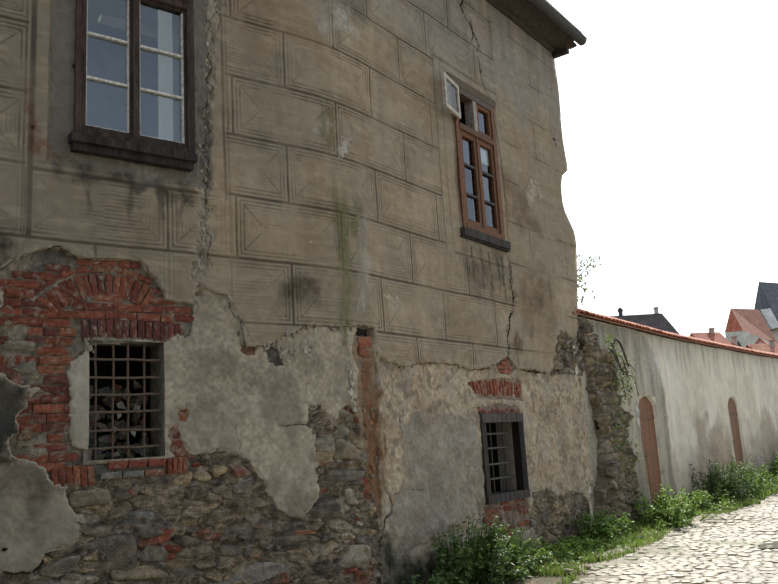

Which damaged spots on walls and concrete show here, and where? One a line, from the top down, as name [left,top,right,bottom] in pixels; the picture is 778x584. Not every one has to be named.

crack [195,0,229,299]
crack [460,0,508,238]
flaking render [0,249,194,490]
crack [506,257,545,374]